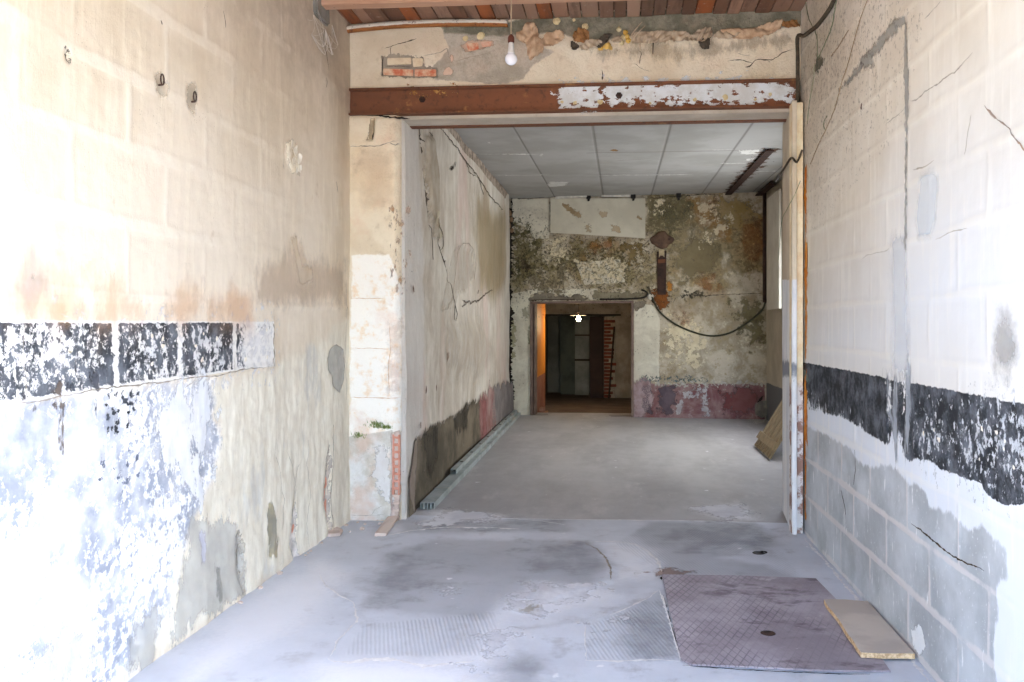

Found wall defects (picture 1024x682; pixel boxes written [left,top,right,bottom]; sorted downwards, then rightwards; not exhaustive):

spalling [381,40,494,79]
peeling [550,70,801,115]
crack [886,52,973,124]
crack [345,115,550,400]
rust [651,281,673,311]
peeling [5,294,94,415]
peeling [121,300,280,514]
water stain [634,377,677,417]
water stain [718,387,768,425]
water stain [409,381,514,517]
peeling [909,379,1024,511]
crack [912,524,981,569]